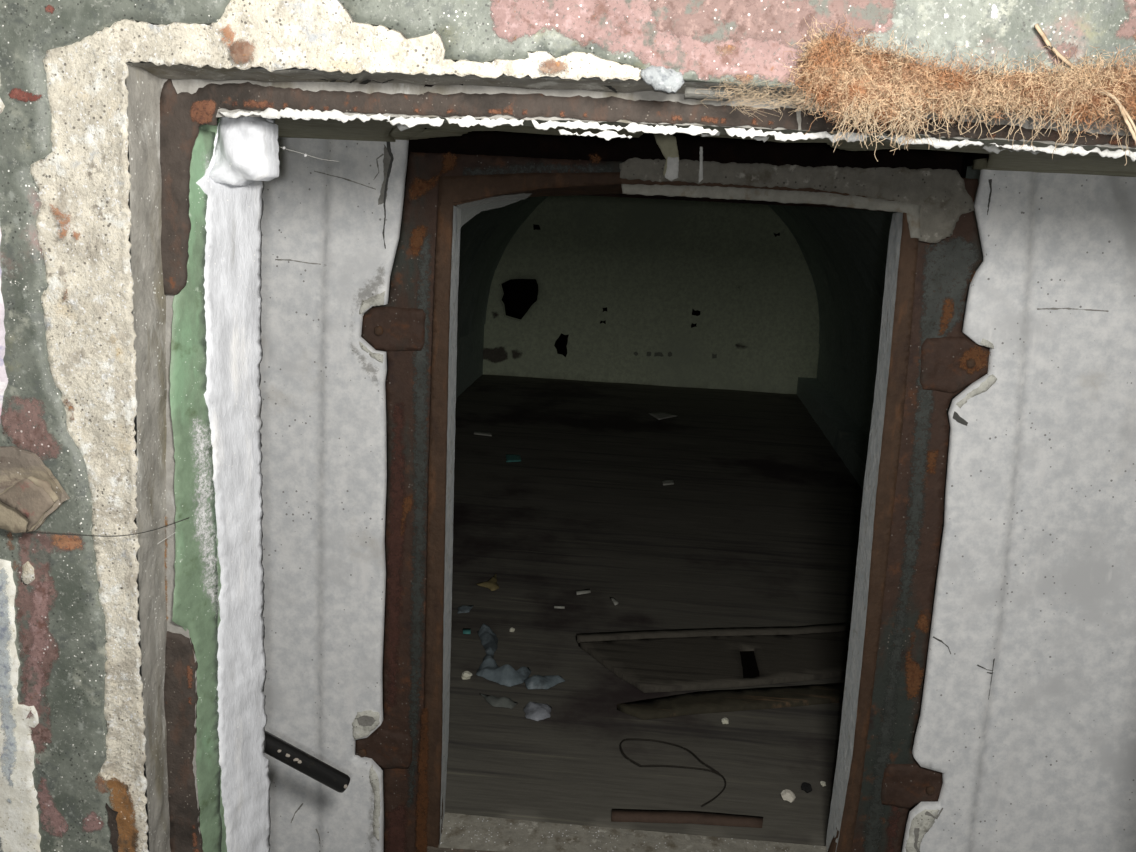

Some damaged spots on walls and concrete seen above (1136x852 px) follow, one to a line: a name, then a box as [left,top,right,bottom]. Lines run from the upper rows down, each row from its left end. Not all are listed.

spalling [220,108,1136,186]
rust [959,346,990,374]
spalling [0,0,896,852]
rust [386,403,413,707]
rust [905,611,929,699]
rust [95,774,139,852]